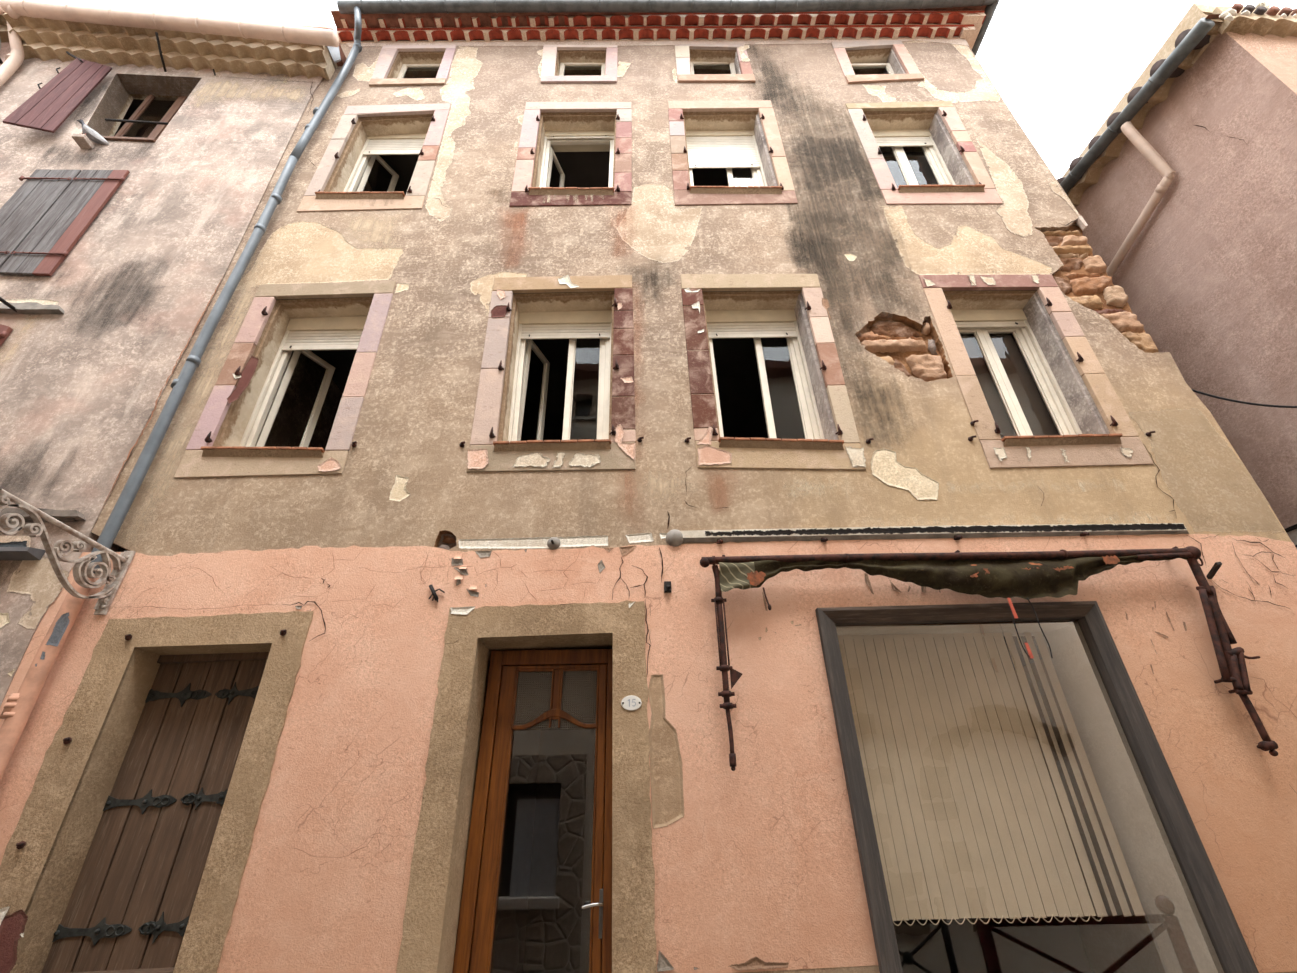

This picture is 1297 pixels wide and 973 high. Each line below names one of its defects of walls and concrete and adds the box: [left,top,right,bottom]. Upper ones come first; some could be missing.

peeling [616,183,703,263]
water stain [762,64,901,328]
peeling [881,141,1159,353]
spalling [857,318,948,382]
crack [119,467,728,674]
peeling [846,446,939,500]
crack [1143,444,1290,609]
peeling [0,907,28,973]